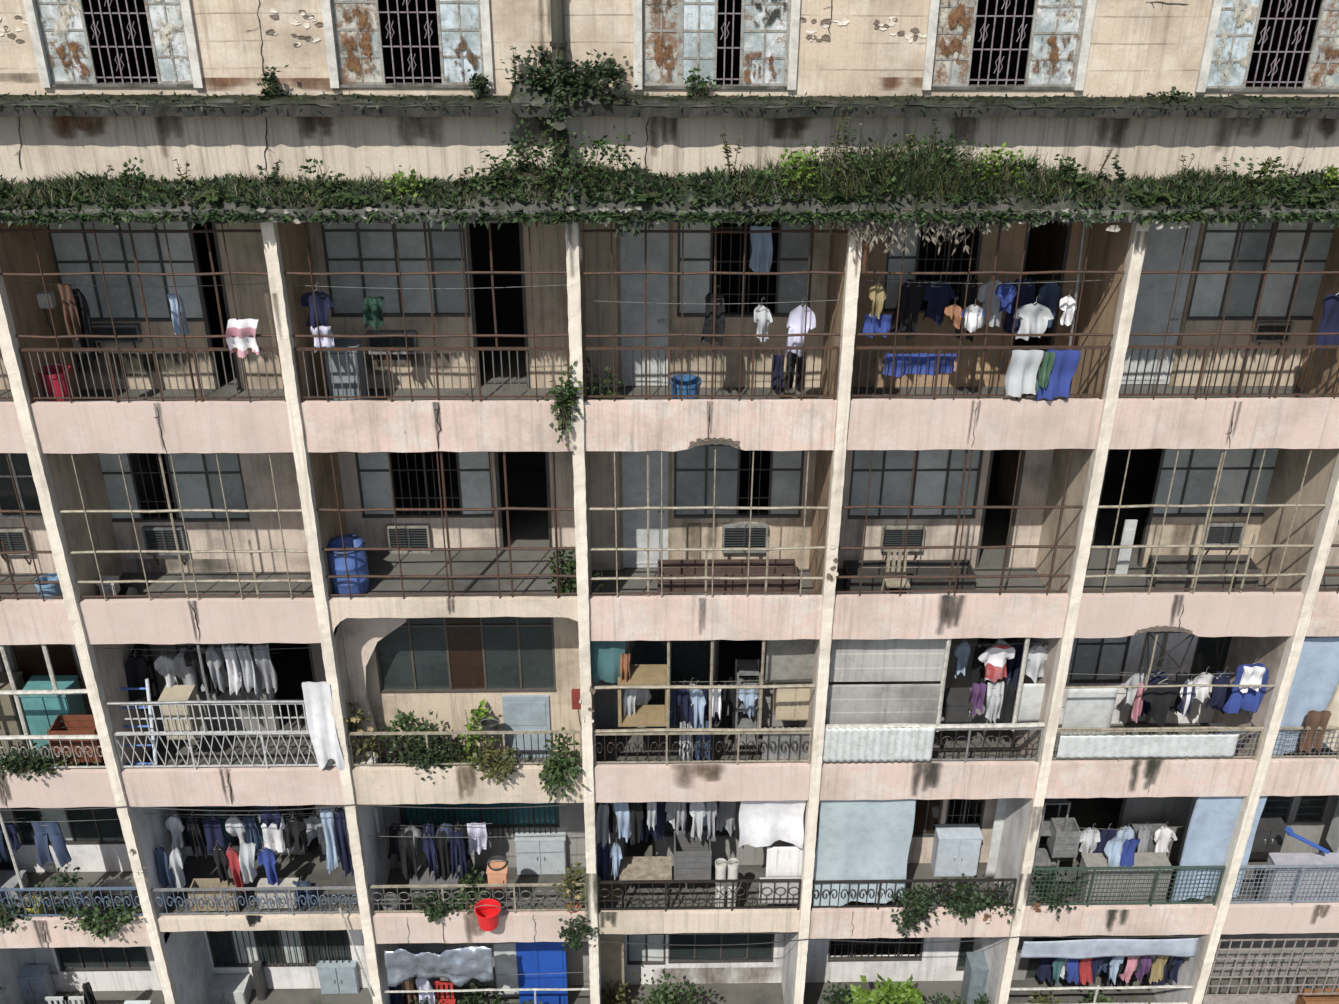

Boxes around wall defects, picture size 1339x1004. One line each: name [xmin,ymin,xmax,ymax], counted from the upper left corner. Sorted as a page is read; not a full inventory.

peeling [0,0,81,43]
corrosion [50,41,89,79]
crack [245,1,264,74]
spalling [265,8,323,47]
corrosion [445,36,478,82]
spalling [799,16,850,42]
spalling [874,16,927,43]
corrosion [938,1,971,72]
corrosion [1036,35,1074,75]
water stain [939,595,964,630]
water stain [913,762,940,794]
water stain [1131,758,1162,789]